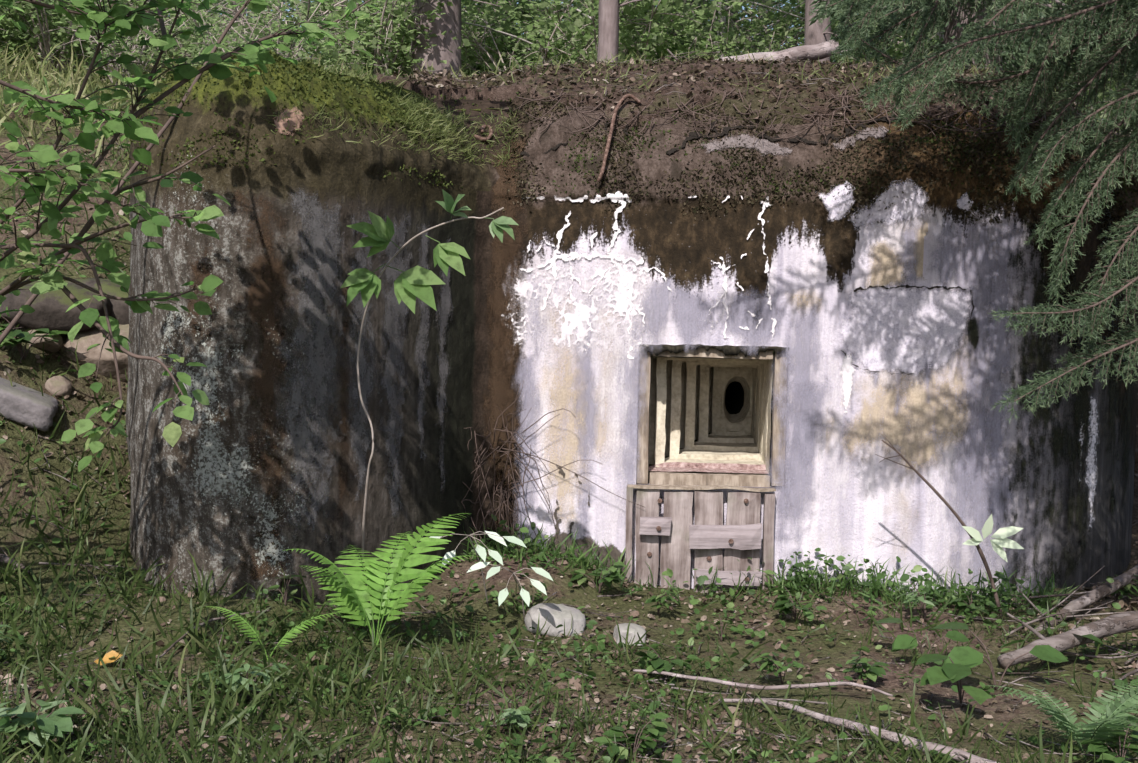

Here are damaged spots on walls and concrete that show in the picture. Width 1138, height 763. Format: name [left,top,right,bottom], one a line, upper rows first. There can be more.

peeling [819,181,927,226]
peeling [957,194,973,209]
leakage [276,191,452,539]
leakage [501,191,780,540]
leakage [776,310,824,571]
spalling [819,284,979,533]
leakage [934,197,1134,593]